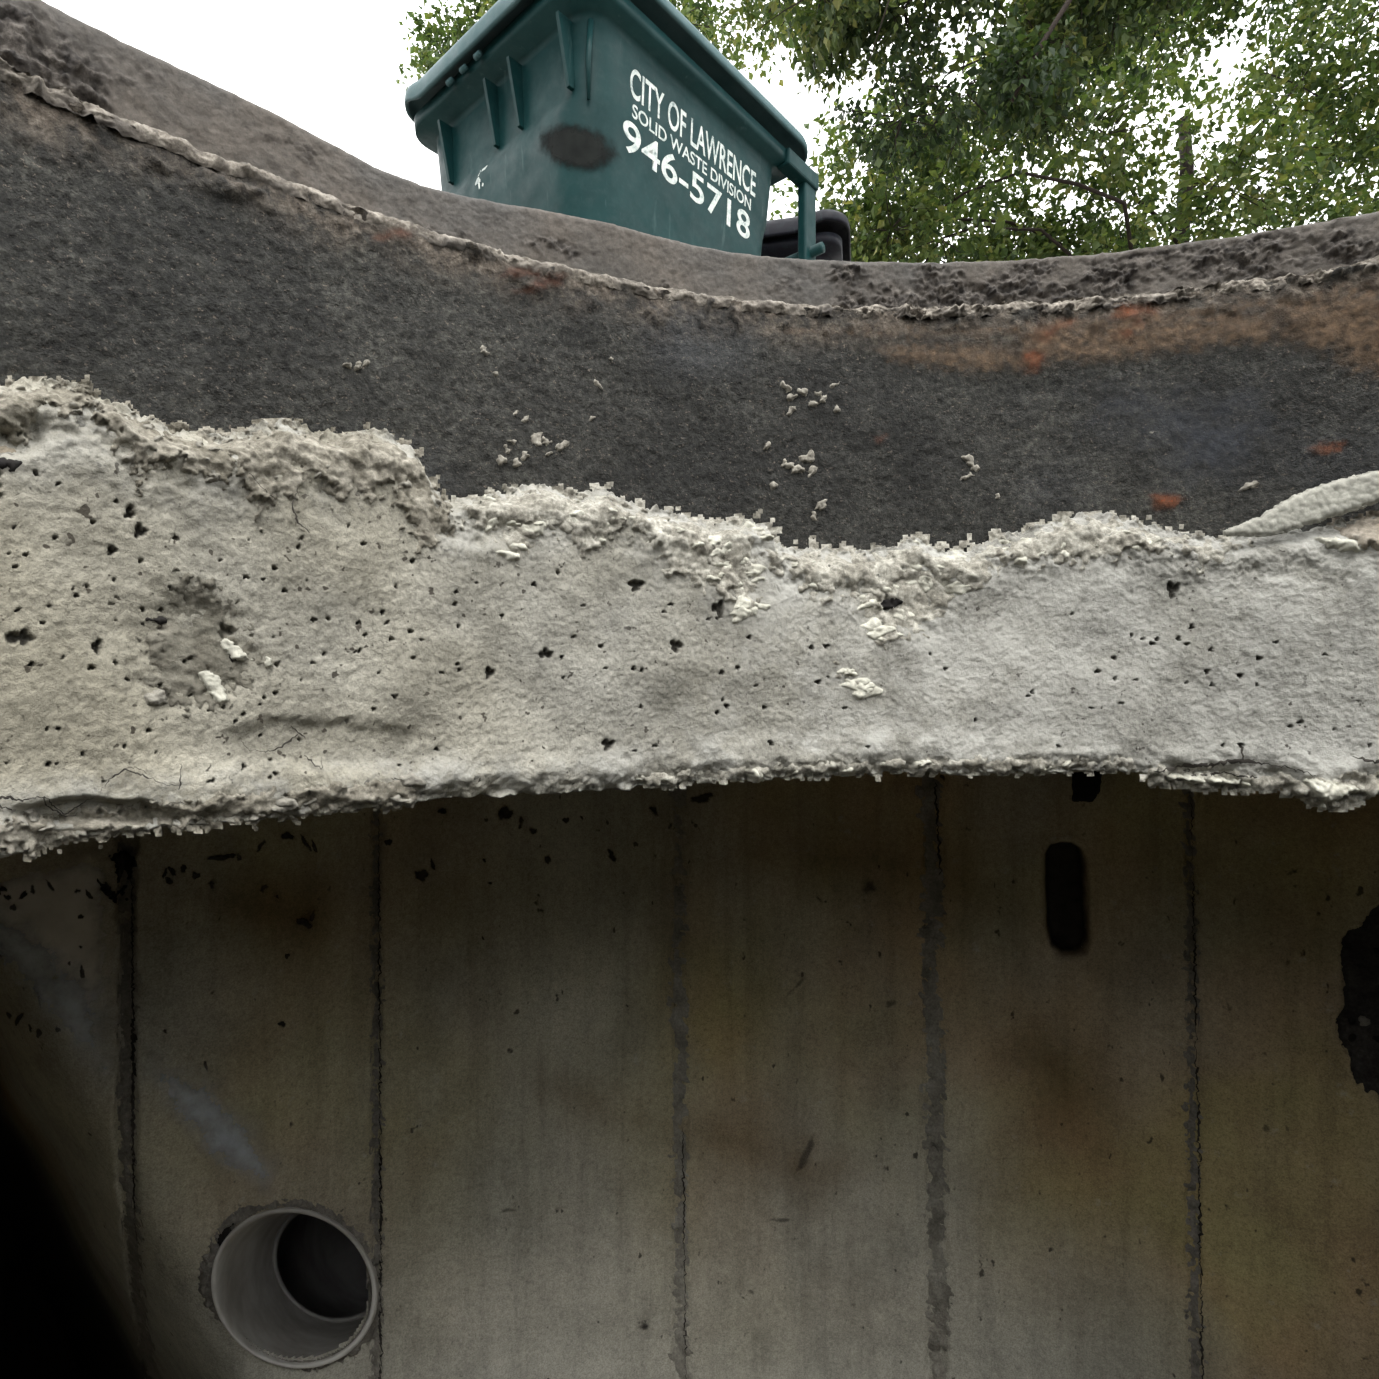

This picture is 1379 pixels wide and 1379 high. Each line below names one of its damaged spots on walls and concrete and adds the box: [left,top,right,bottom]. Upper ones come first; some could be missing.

rust [903,306,1264,367]
spalling [0,374,1254,650]